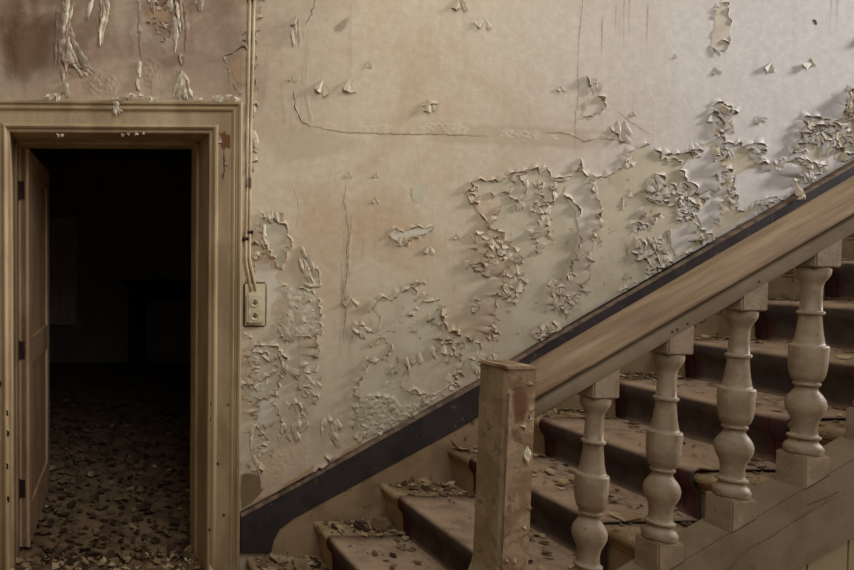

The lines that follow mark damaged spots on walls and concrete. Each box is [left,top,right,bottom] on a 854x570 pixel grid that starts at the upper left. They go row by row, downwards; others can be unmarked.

peeling [43,0,95,102]
peeling [85,0,110,46]
peeling [109,0,241,116]
peeling [709,0,734,56]
peeling [241,76,854,508]